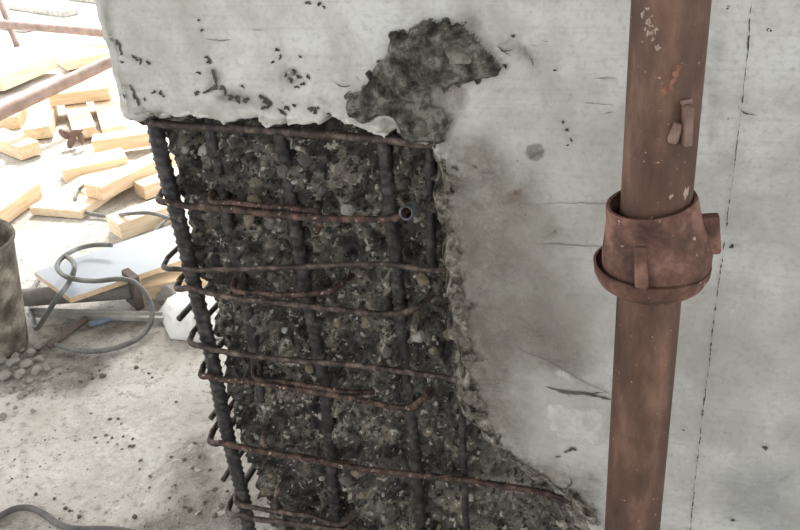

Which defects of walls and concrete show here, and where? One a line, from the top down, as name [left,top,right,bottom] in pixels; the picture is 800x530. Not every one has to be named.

spalling [194,56,249,104]
spalling [126,95,601,530]
crack [516,348,611,400]
crack [690,4,757,530]